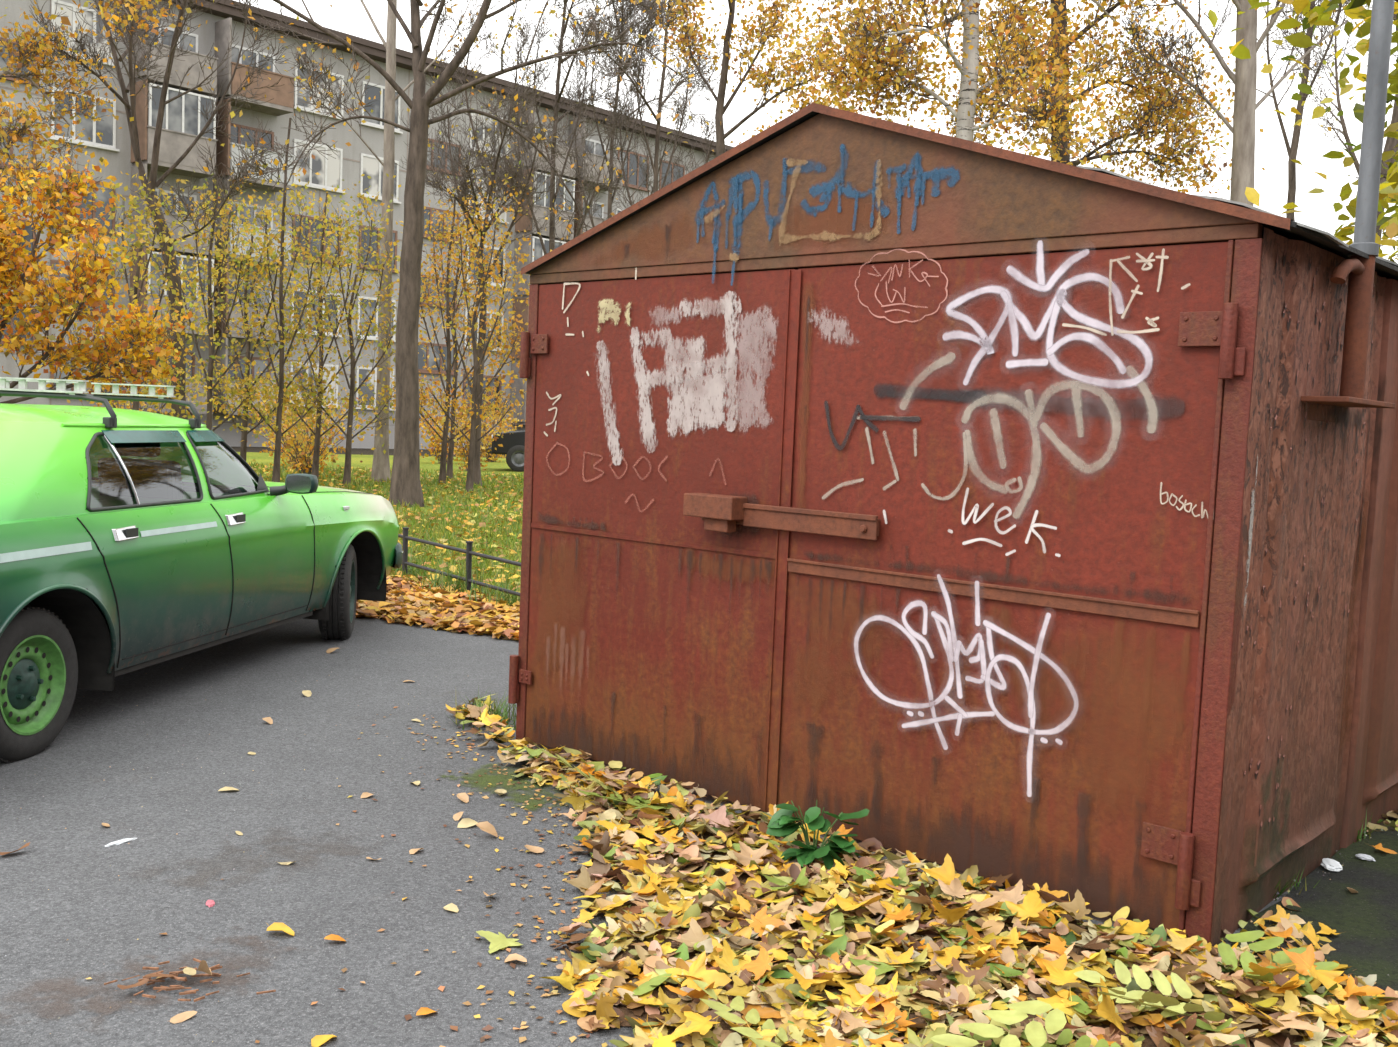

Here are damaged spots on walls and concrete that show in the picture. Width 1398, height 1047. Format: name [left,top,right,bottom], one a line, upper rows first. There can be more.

corrosion [796,199,882,237]
corrosion [1323,386,1381,485]